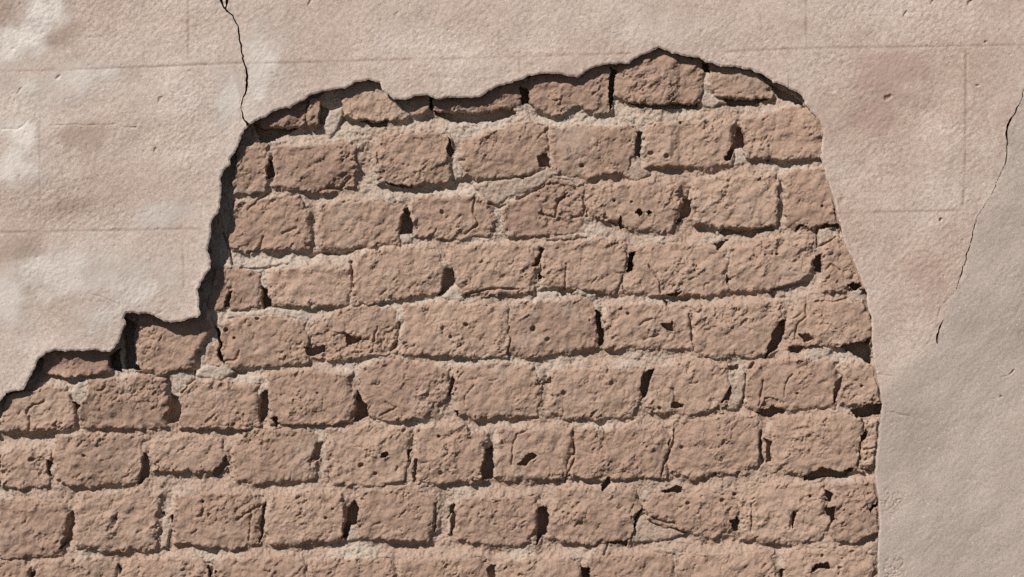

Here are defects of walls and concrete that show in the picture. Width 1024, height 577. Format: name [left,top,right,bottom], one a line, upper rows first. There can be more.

crack [220,0,249,127]
flaking render [0,48,882,577]
crack [926,90,1024,345]